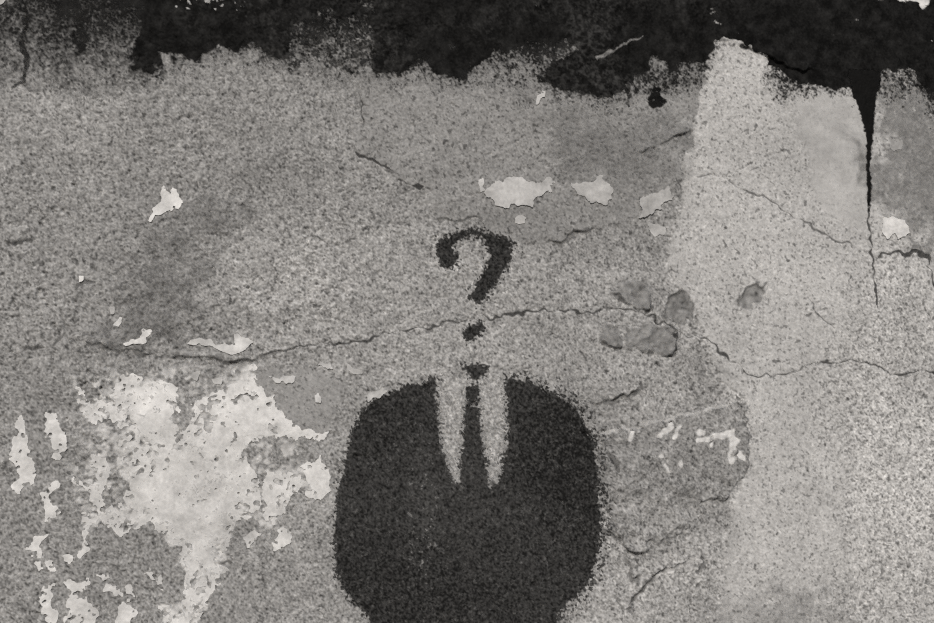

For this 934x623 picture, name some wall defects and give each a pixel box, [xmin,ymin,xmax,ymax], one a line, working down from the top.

peeling [149,185,183,222]
peeling [478,176,555,224]
peeling [571,175,613,205]
peeling [881,216,910,239]
crack [867,213,934,307]
spalling [664,290,694,325]
peeling [88,328,158,357]
crack [293,320,455,349]
crack [487,308,678,351]
crack [709,340,788,378]
crack [821,359,934,376]
peeling [9,333,331,623]